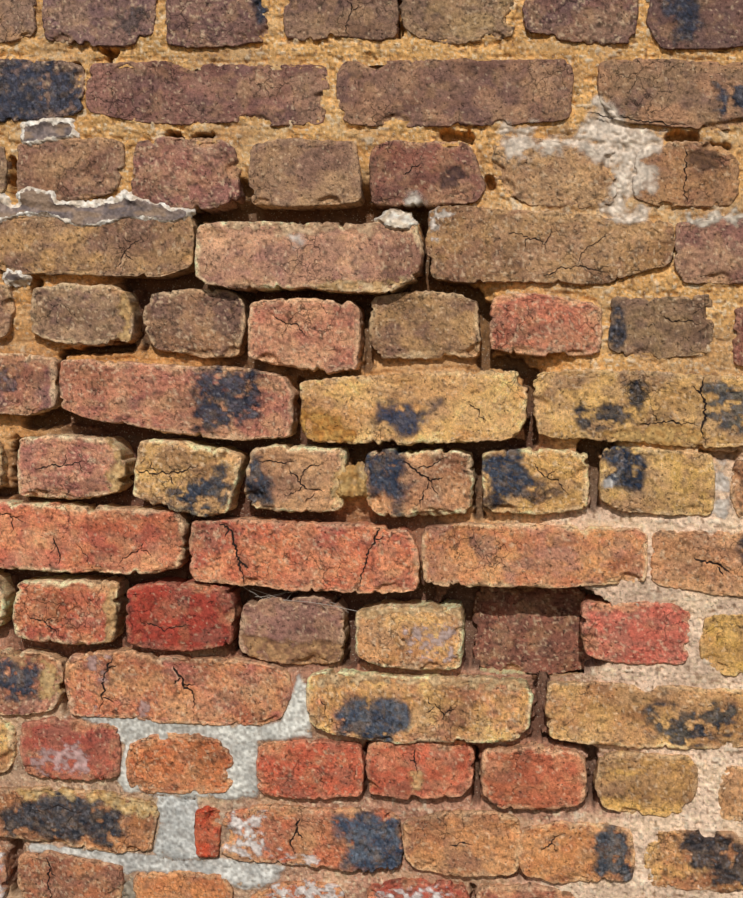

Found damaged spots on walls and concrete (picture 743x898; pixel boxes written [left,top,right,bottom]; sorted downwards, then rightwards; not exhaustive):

crack [509,232,551,249]
crack [544,233,612,276]
crack [38,455,89,472]
crack [259,460,328,501]
crack [49,538,89,564]
crack [219,523,248,582]
crack [357,528,383,589]
crack [99,655,117,709]
crack [173,666,195,709]
crack [289,819,303,850]
crack [46,858,55,898]
damp [376,886,449,898]